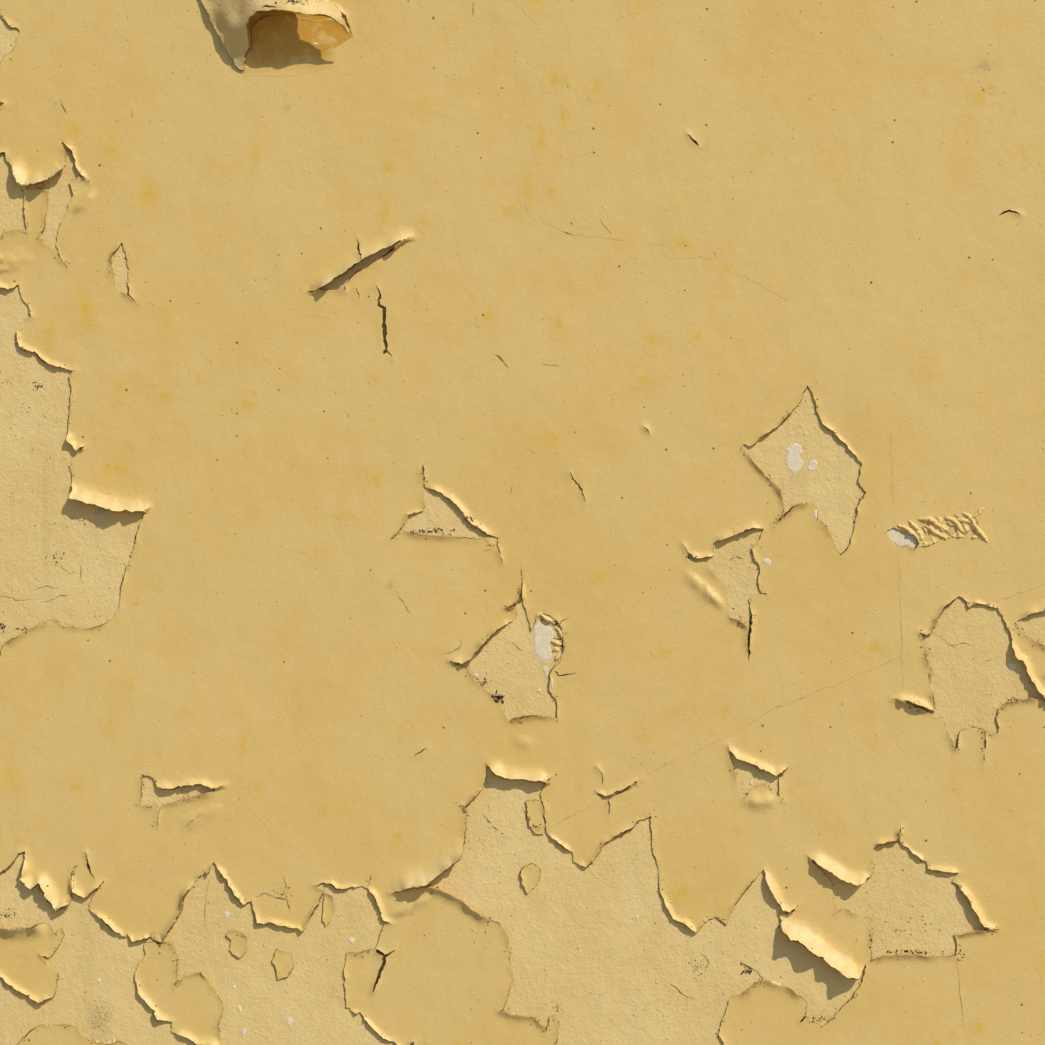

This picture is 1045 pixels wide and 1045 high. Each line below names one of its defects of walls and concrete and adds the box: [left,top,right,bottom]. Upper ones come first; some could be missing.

peeling [201,0,352,76]
peeling [0,143,90,266]
crack [377,287,392,356]
peeling [0,282,153,654]
peeling [391,463,500,553]
peeling [687,386,866,653]
peeling [887,507,989,548]
peeling [450,571,566,723]
peeling [895,597,1045,763]
peeling [728,747,792,801]
peeling [0,760,1000,1045]
crack [376,949,388,983]